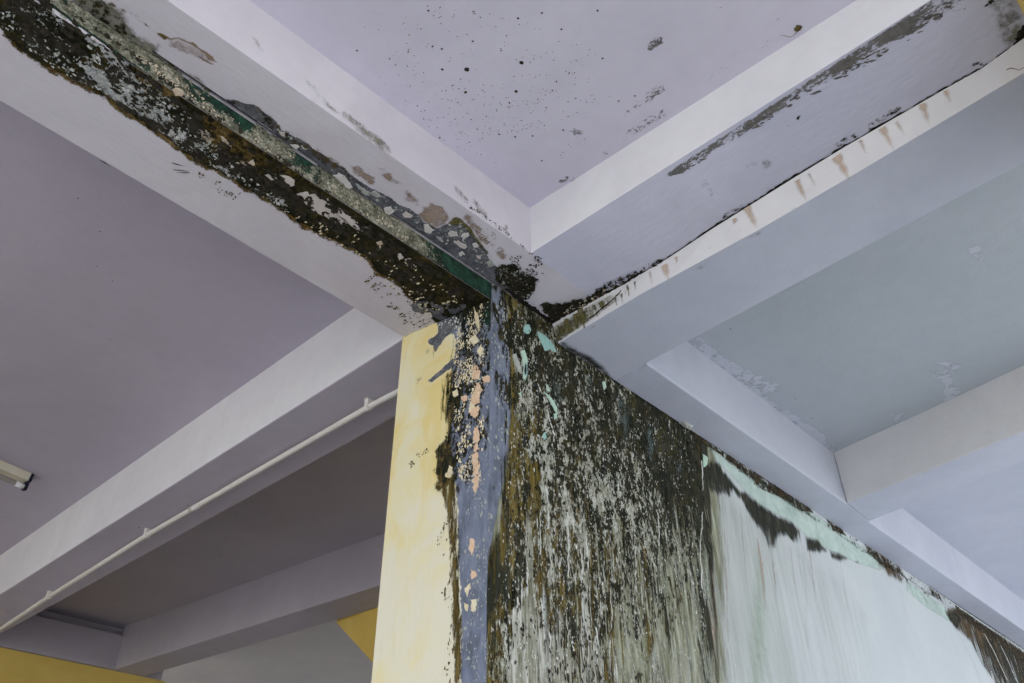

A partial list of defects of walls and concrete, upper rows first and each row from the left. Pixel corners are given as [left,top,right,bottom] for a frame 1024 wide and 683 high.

leakage [984,0,1024,43]
peeling [136,54,219,118]
leakage [0,0,813,683]
rust [553,281,636,341]
peeling [220,96,516,683]
leakage [806,539,846,560]
leakage [862,545,1024,683]